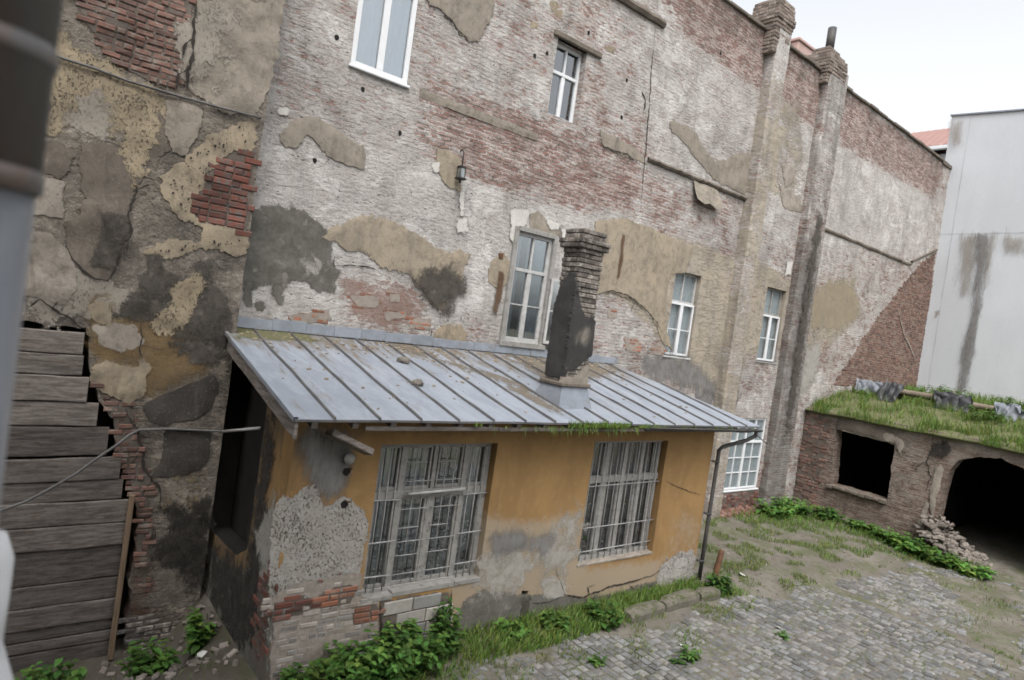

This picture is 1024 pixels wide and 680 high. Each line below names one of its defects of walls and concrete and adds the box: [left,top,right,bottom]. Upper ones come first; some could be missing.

spalling [75,0,197,89]
leakage [24,203,341,367]
spalling [190,147,262,238]
flaking render [322,214,471,330]
crack [600,34,655,211]
flaking render [594,217,693,352]
leakage [782,212,859,443]
leakage [957,234,1021,394]
leakage [148,403,276,680]
peeling [250,484,386,680]
crack [536,568,663,604]